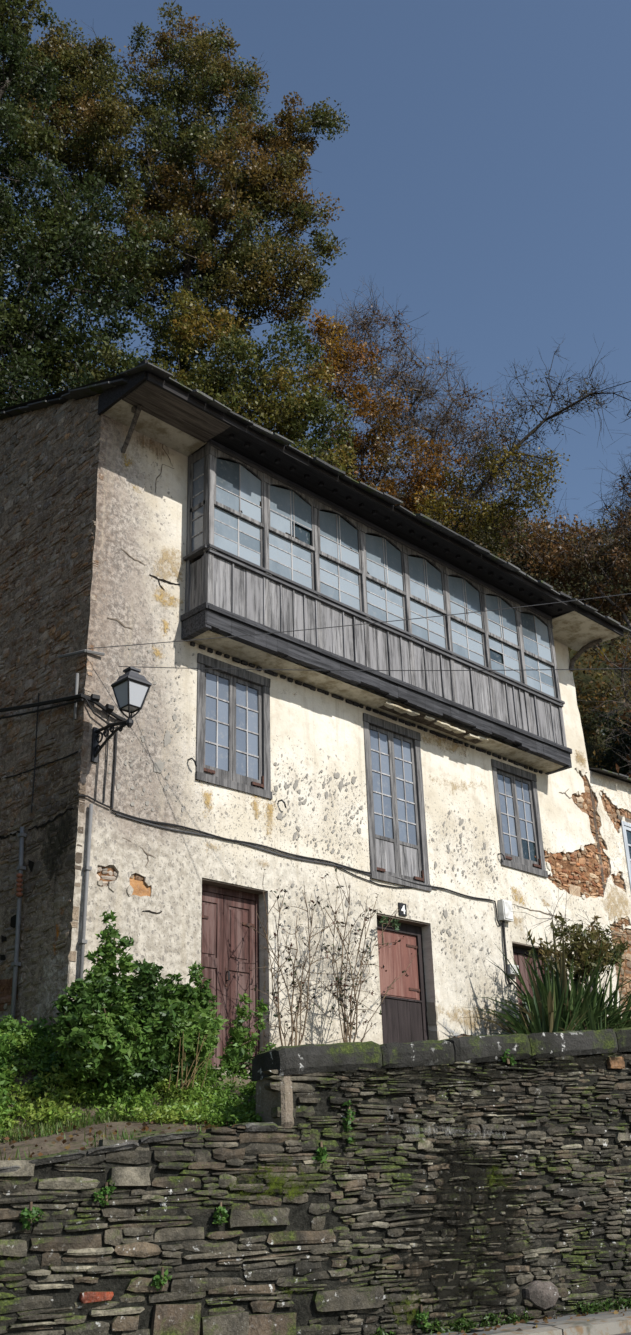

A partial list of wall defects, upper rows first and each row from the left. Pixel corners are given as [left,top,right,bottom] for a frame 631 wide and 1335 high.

spalling [96,865,155,897]
spalling [535,767,631,900]